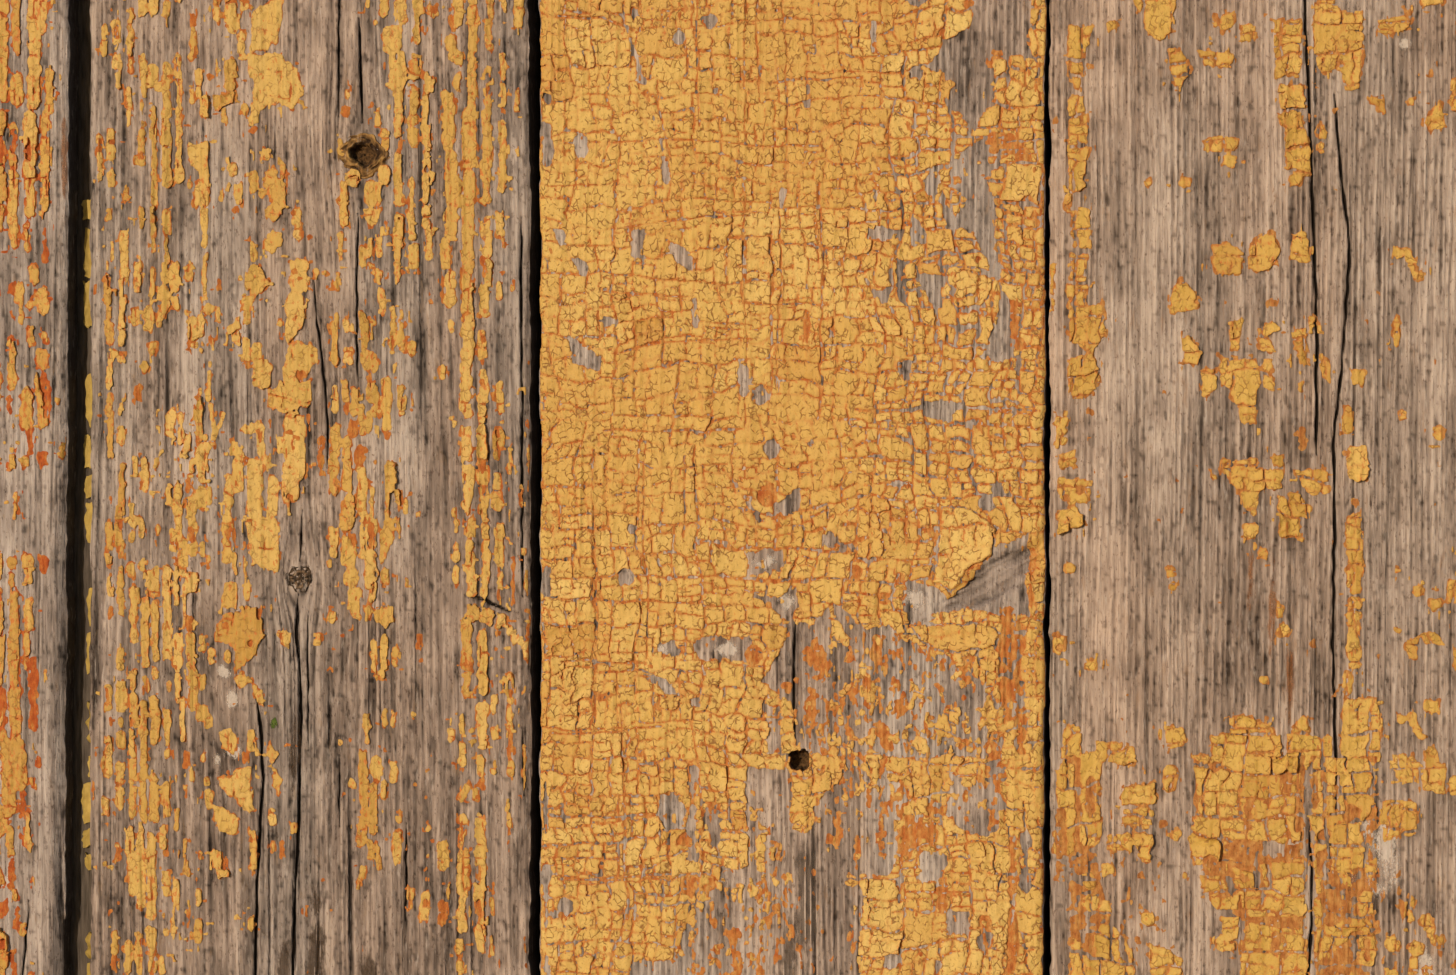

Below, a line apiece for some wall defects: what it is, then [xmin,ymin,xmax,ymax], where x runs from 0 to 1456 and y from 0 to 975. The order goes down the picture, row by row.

peeling [0,0,66,472]
peeling [4,490,26,520]
peeling [0,550,50,975]
peeling [81,0,531,975]
crack [790,621,798,736]